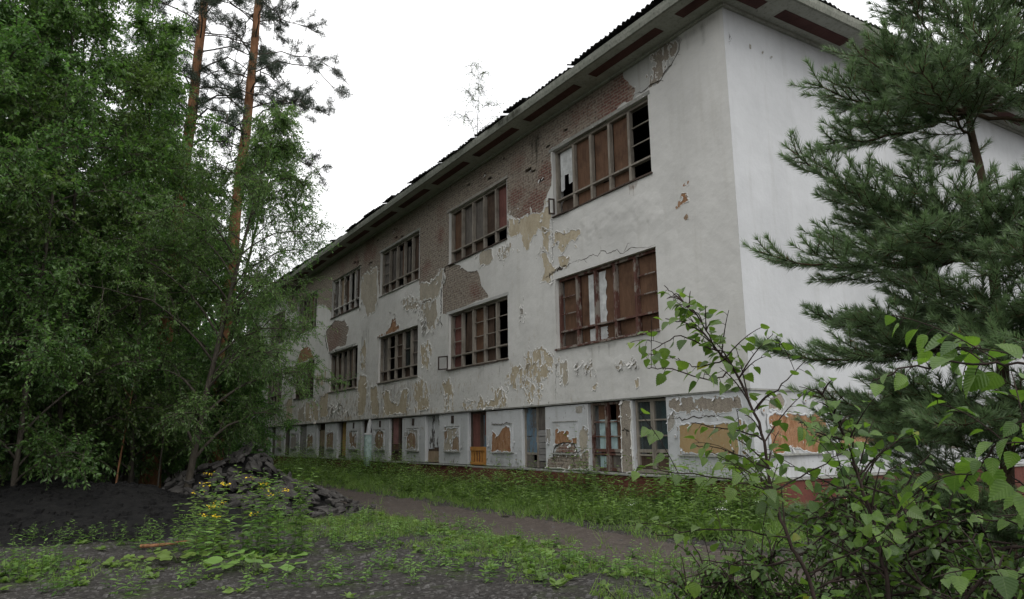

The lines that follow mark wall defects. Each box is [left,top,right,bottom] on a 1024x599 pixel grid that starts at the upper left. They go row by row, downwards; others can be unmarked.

peeling [675,181,690,220]
flaking render [286,37,680,457]
crack [548,224,653,278]
peeling [487,425,517,461]
flaking render [545,406,590,472]
peeling [666,391,879,469]